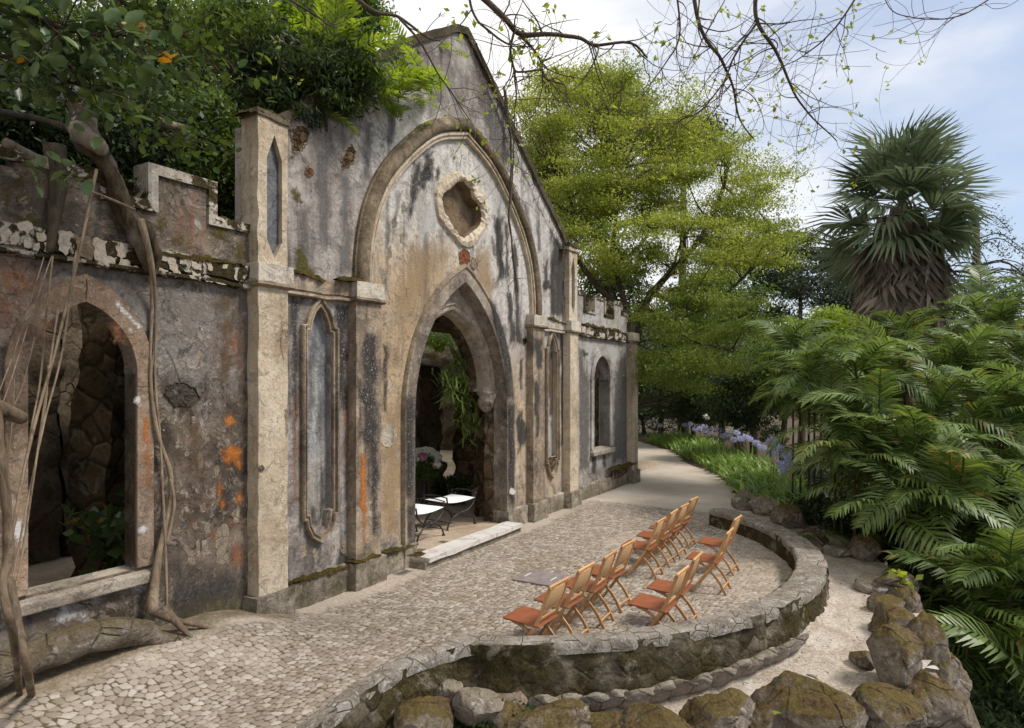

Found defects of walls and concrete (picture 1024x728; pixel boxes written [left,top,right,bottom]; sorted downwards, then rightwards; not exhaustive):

flaking render [288,123,312,155]
flaking render [340,143,356,171]
leakage [385,150,440,289]
peeling [0,221,139,268]
peeling [159,256,239,285]
flaking render [458,248,478,270]
leakage [474,158,563,503]
leakage [334,305,418,537]
flaking render [164,382,240,566]
corrosion [223,445,242,468]
corrosion [359,454,367,537]